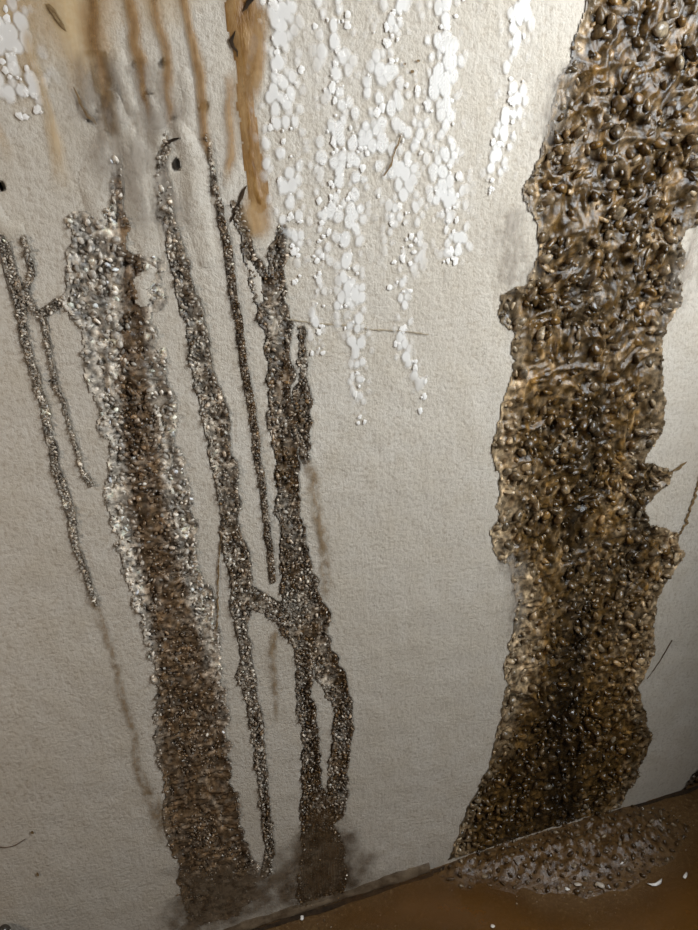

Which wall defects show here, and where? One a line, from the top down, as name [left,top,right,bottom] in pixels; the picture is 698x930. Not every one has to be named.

rust [0,0,20,29]
efflorescence [0,0,46,120]
rust [51,0,116,132]
efflorescence [487,0,534,195]
efflorescence [260,0,472,414]
rust [114,0,354,927]
leakage [308,466,328,567]
crack [661,462,698,538]
leakage [170,812,364,930]